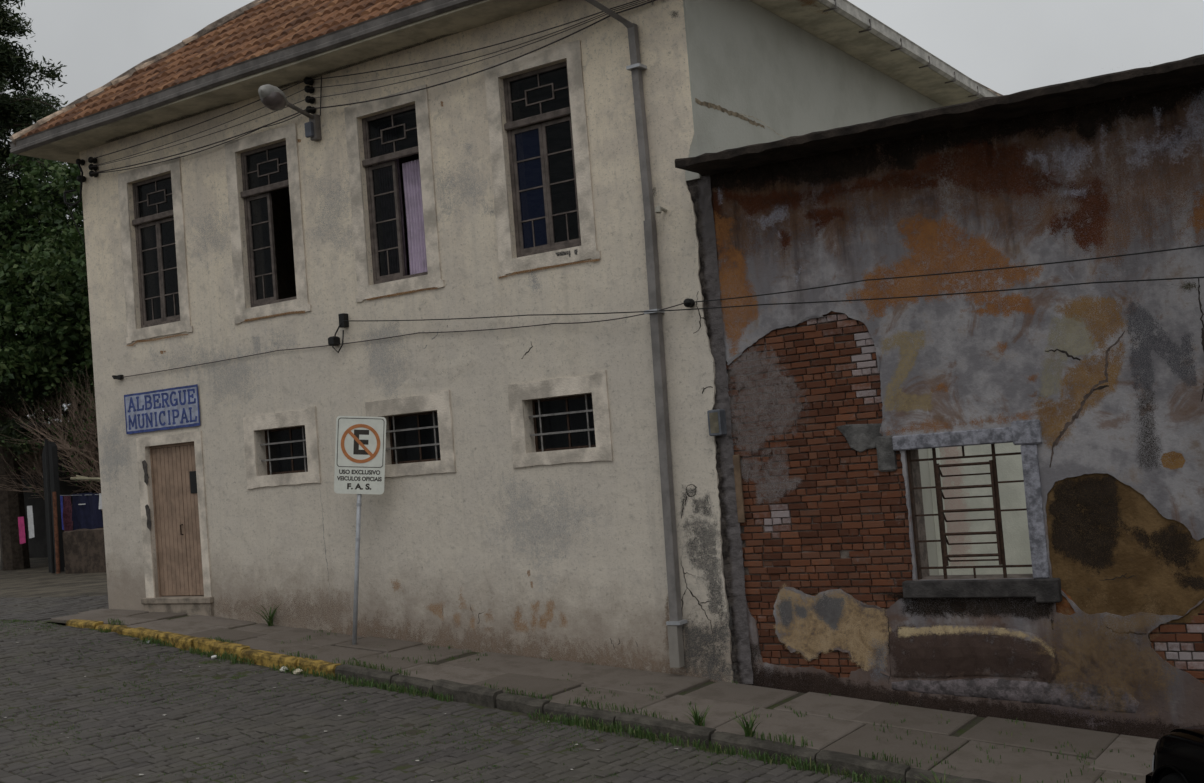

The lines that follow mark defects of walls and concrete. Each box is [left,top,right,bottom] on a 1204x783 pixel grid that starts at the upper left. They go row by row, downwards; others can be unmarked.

damp [710,82,1204,286]
flaking render [686,175,913,684]
crack [1045,331,1125,468]
crack [1196,278,1204,351]
damp [214,470,737,682]
damp [750,474,1204,739]
peeling [1046,473,1204,684]